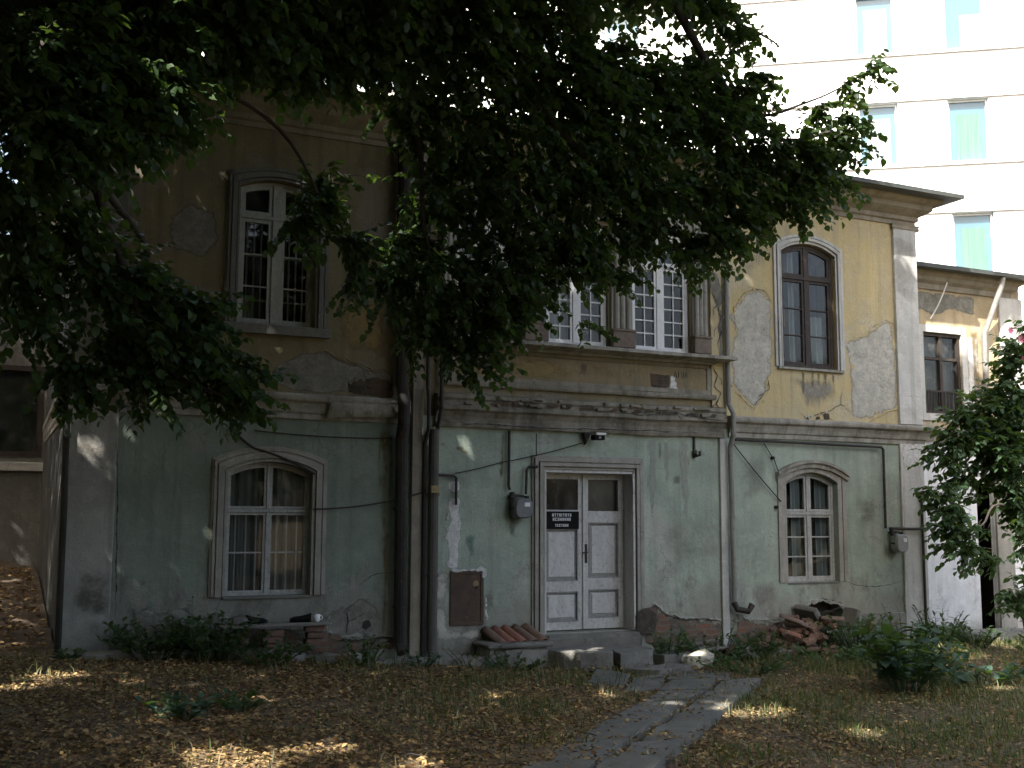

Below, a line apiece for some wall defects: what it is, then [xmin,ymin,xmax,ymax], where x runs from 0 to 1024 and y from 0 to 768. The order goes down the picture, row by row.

peeling [918,291,974,314]
peeling [709,272,777,410]
spalling [485,388,717,418]
water stain [800,373,834,403]
peeling [845,319,898,423]
crack [331,613,393,642]
peeling [437,572,482,641]
spalling [636,601,722,647]
spalling [735,597,846,645]